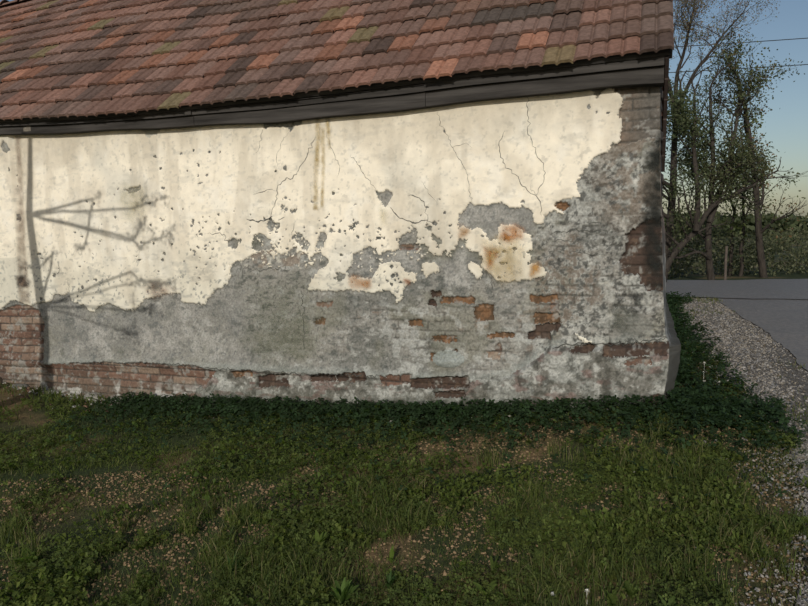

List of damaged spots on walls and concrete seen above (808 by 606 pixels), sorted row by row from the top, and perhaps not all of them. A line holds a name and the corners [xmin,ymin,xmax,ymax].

crack [247,130,377,232]
peeling [0,86,681,408]
crack [390,193,435,224]
rust [502,227,520,241]